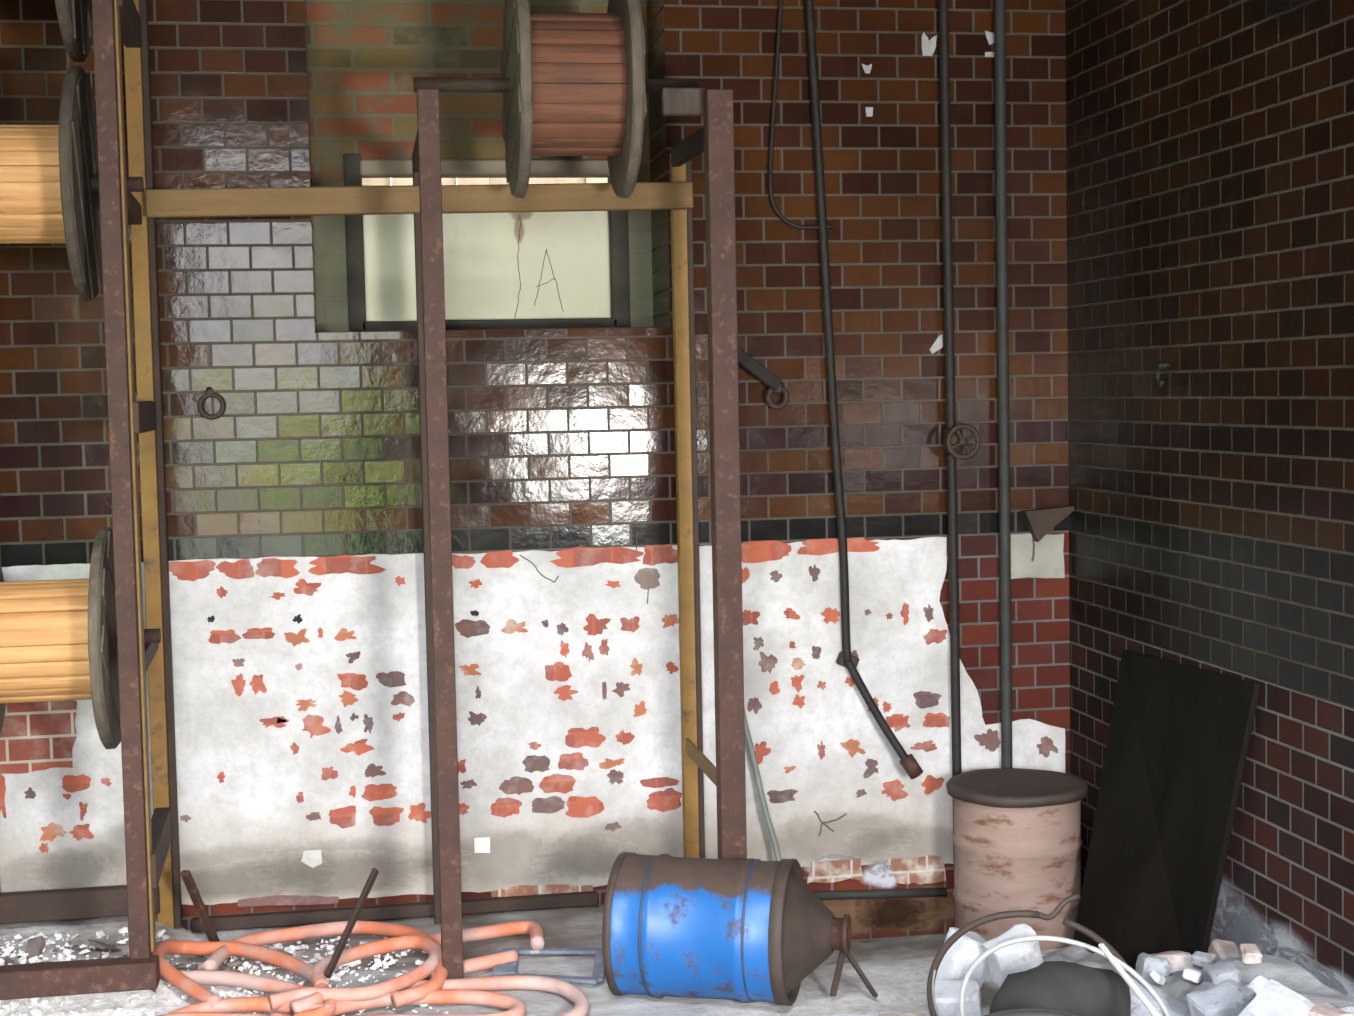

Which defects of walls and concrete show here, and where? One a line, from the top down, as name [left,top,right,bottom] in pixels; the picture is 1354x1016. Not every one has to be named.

flaking render [169,555,406,600]
flaking render [549,544,678,590]
flaking render [741,537,880,584]
flaking render [865,603,948,645]
flaking render [455,610,640,701]
flaking render [743,608,826,714]
flaking render [0,700,112,853]
flaking render [207,614,431,829]
flaking render [491,657,647,831]
flaking render [640,777,682,812]
flaking render [817,739,944,801]
flaking render [868,691,950,752]